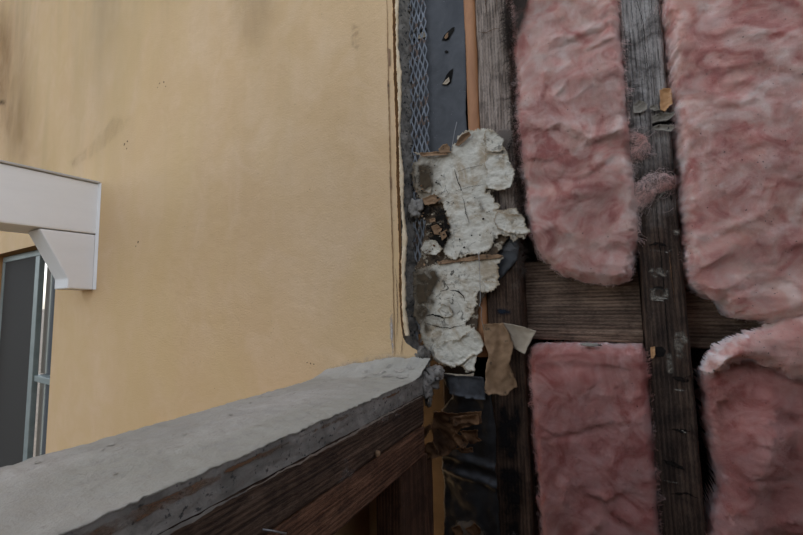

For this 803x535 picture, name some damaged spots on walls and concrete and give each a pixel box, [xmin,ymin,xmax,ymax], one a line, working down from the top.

spalling [633,88,675,132]
spalling [398,0,422,351]
spalling [650,346,666,358]